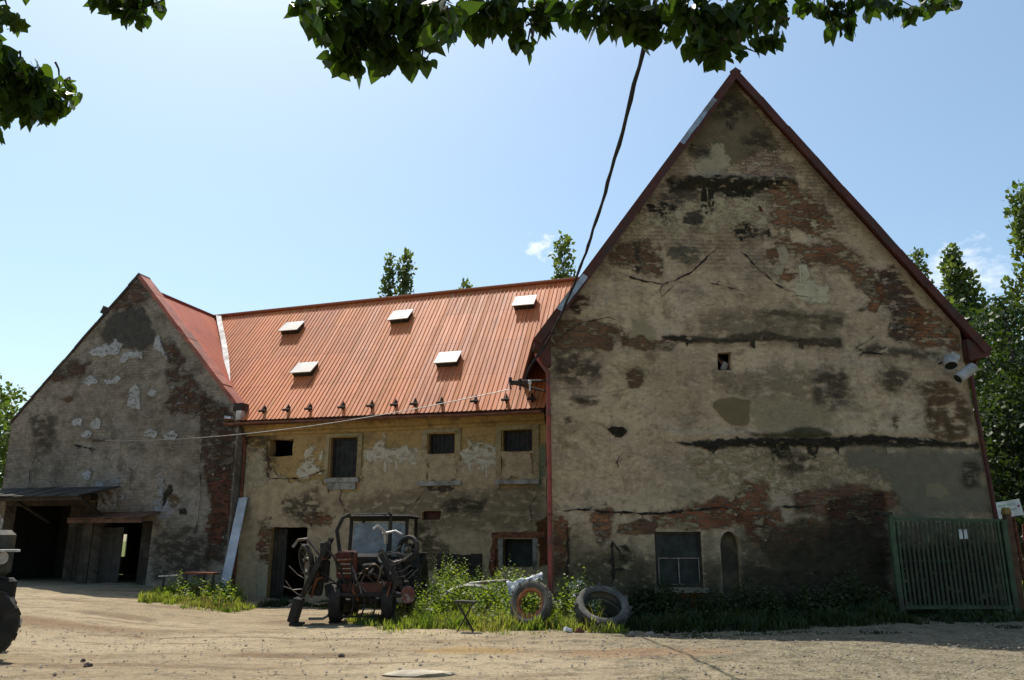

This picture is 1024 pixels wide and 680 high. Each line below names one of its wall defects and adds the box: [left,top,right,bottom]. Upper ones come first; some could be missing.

crack [620,248,807,297]
flaking render [608,143,960,351]
peeling [51,335,898,601]
crack [780,503,812,511]